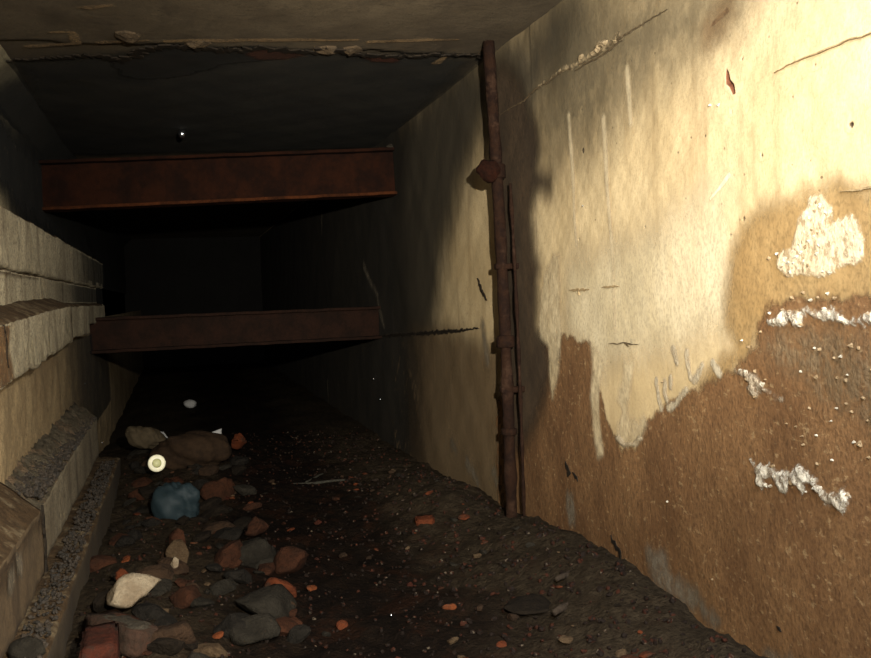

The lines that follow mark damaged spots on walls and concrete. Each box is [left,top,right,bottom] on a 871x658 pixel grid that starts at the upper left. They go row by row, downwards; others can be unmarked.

crack [500,9,667,115]
crack [774,32,871,73]
peeling [767,195,865,278]
water stain [394,65,871,658]
spalling [777,337,871,423]